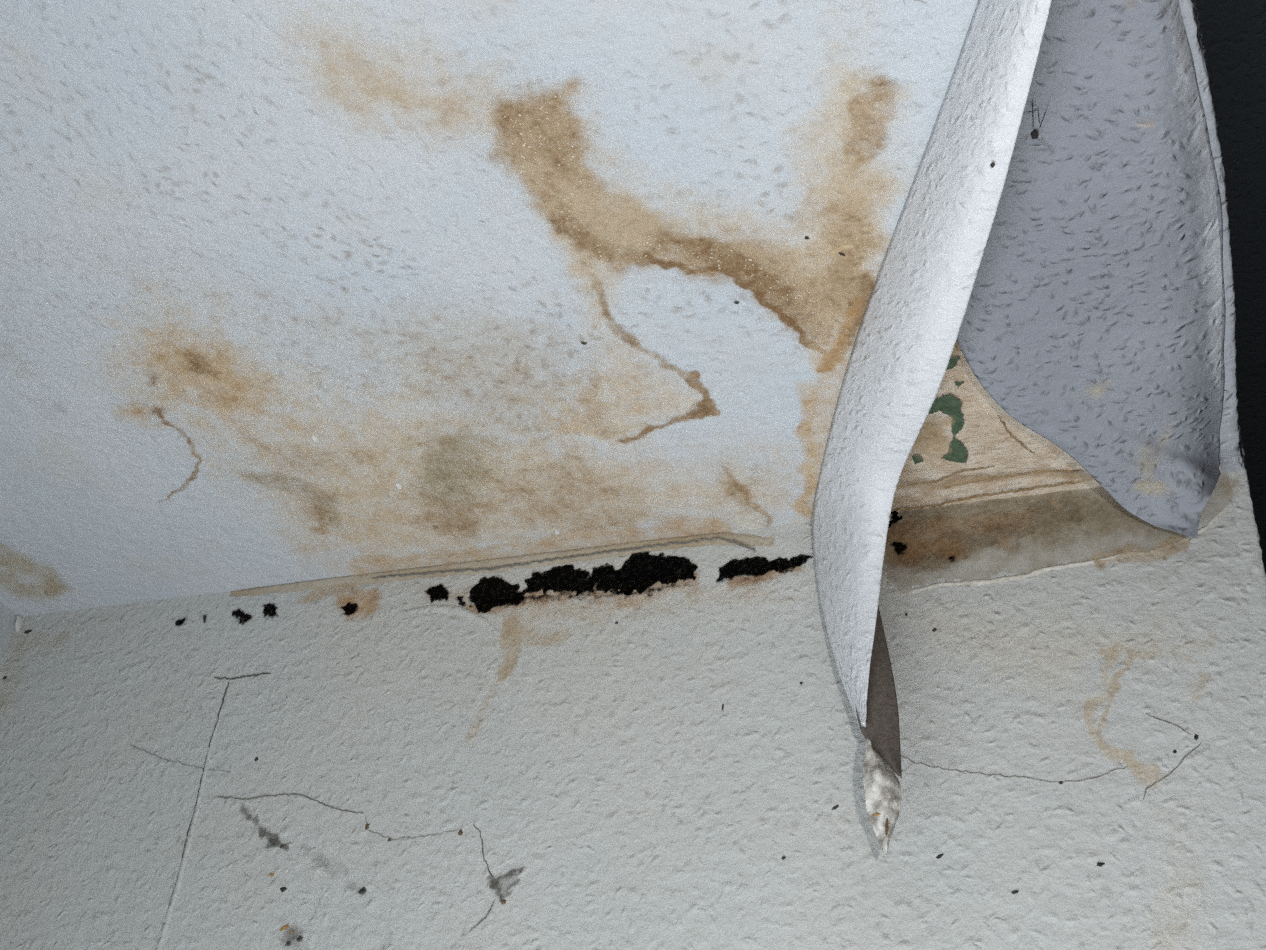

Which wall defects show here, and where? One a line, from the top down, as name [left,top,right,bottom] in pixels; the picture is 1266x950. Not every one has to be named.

water stain [116,323,276,503]
water stain [232,31,901,683]
flaking render [891,339,1102,512]
water stain [0,546,69,597]
water stain [881,473,1238,597]
crack [901,714,1202,800]
water stain [975,629,1161,787]